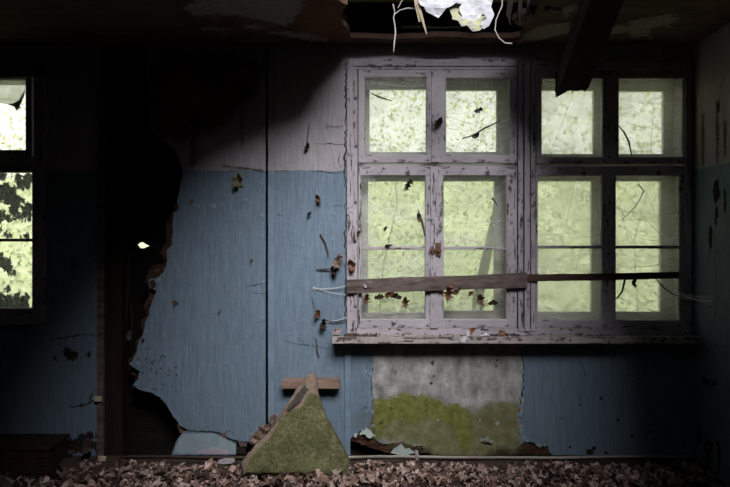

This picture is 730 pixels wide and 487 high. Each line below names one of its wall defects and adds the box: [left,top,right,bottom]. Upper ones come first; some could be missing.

peeling [349,175,367,288]
spalling [126,205,179,411]
peeling [349,344,552,456]